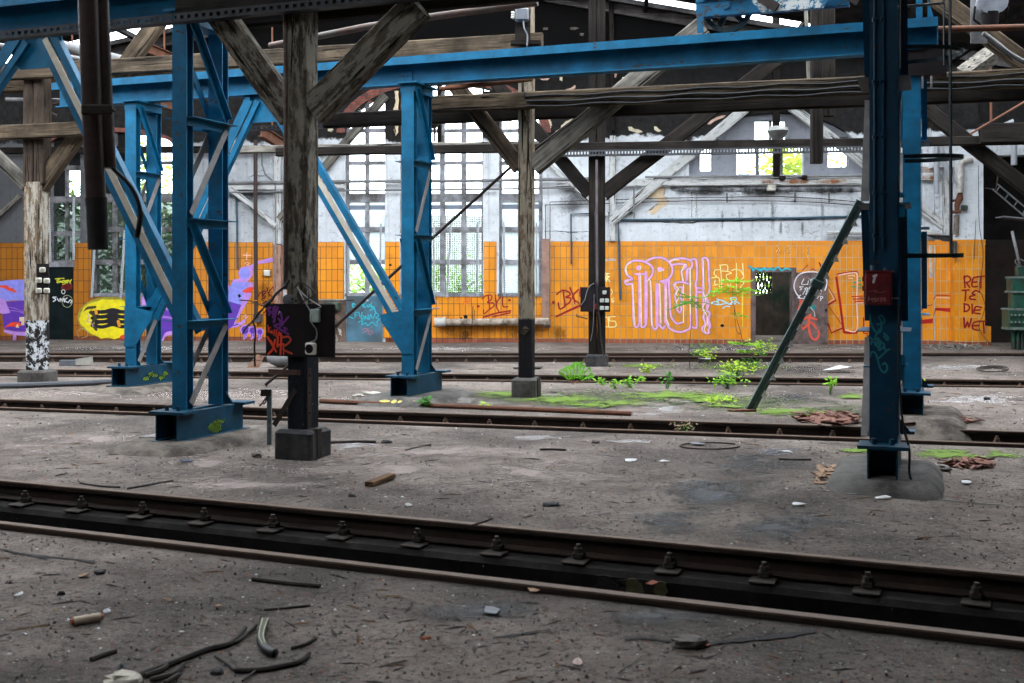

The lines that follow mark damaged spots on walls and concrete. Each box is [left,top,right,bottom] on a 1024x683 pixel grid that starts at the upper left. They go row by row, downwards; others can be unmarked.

flaking render [648,186,668,215]